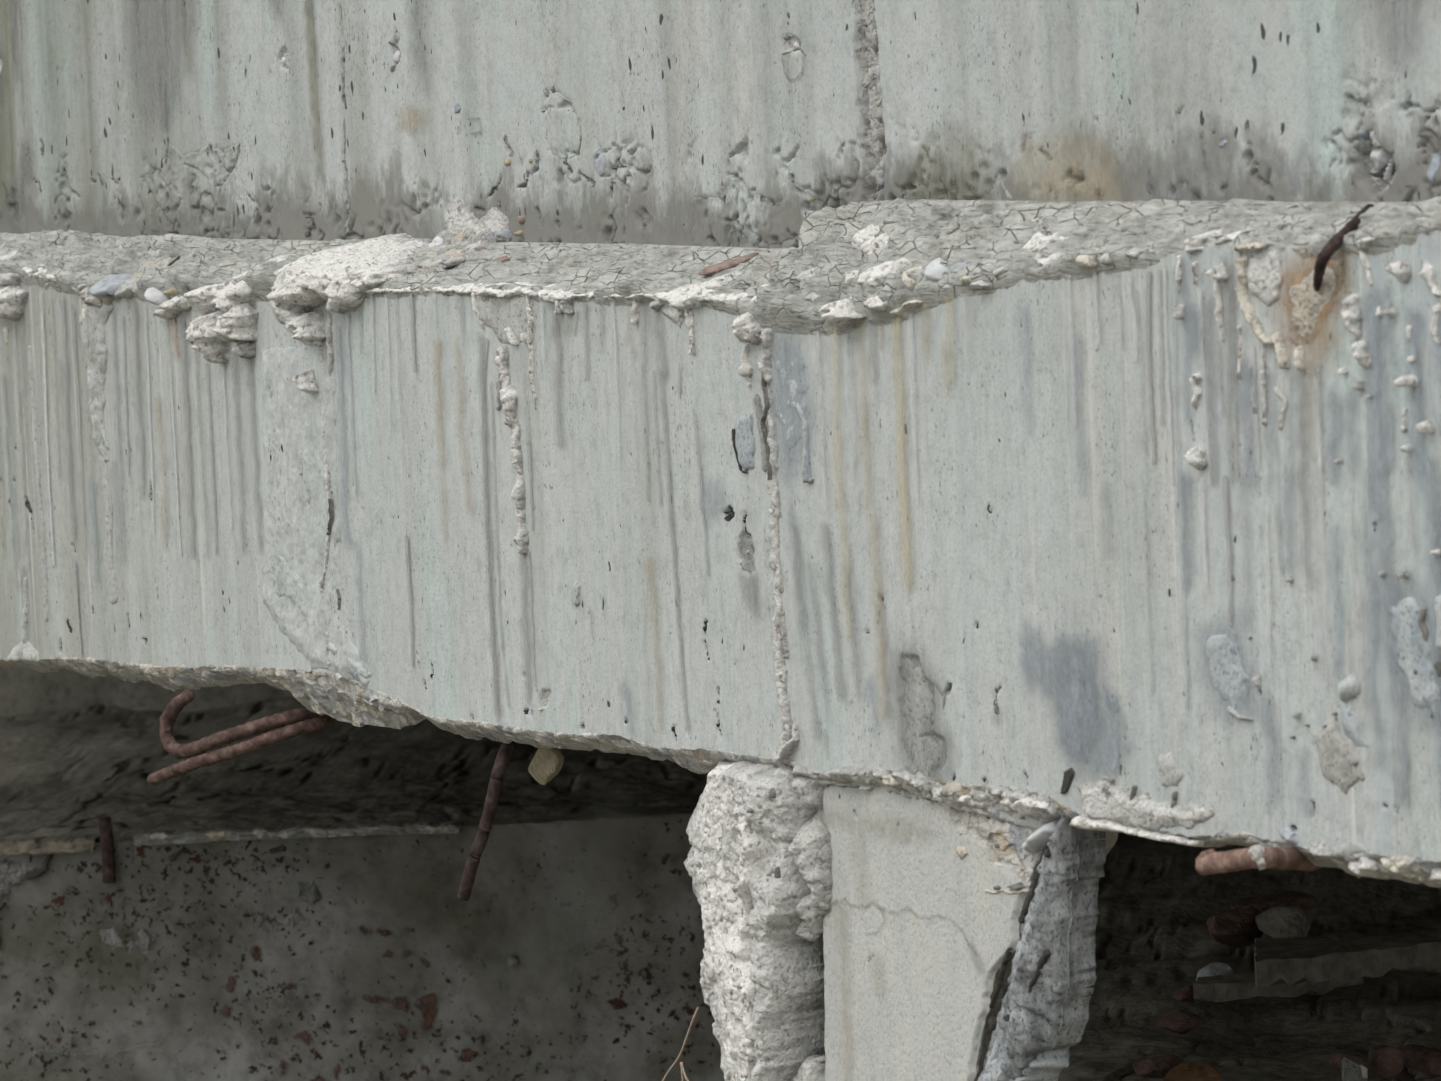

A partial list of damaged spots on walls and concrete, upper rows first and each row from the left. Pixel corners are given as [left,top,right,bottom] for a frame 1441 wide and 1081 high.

damp [1040,157,1109,196]
damp [1146,130,1226,200]
spalling [1351,130,1411,195]
spalling [70,254,194,307]
spalling [404,227,512,274]
spalling [698,252,759,276]
spalling [796,224,974,328]
rust [1286,256,1347,356]
damp [966,229,1306,626]
damp [1404,313,1441,595]
damp [1023,637,1120,773]
spalling [950,809,1059,894]